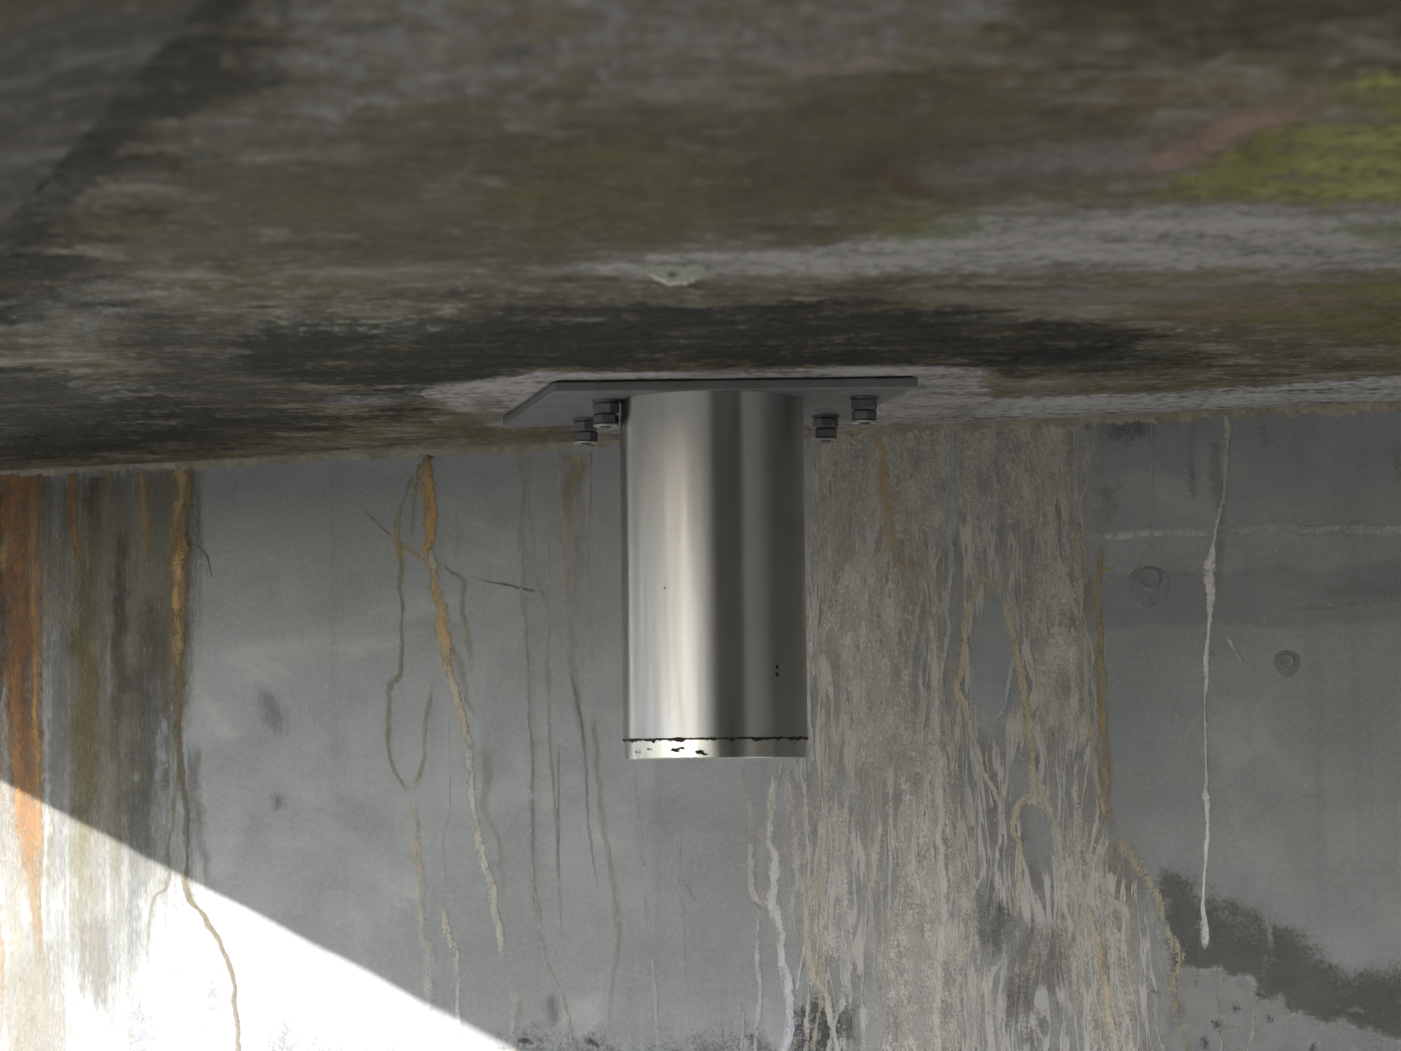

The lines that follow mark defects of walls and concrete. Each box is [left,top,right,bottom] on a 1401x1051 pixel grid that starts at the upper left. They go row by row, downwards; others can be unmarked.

rust [0,474,44,903]
crack [486,581,533,592]
water stain [0,225,1401,1051]